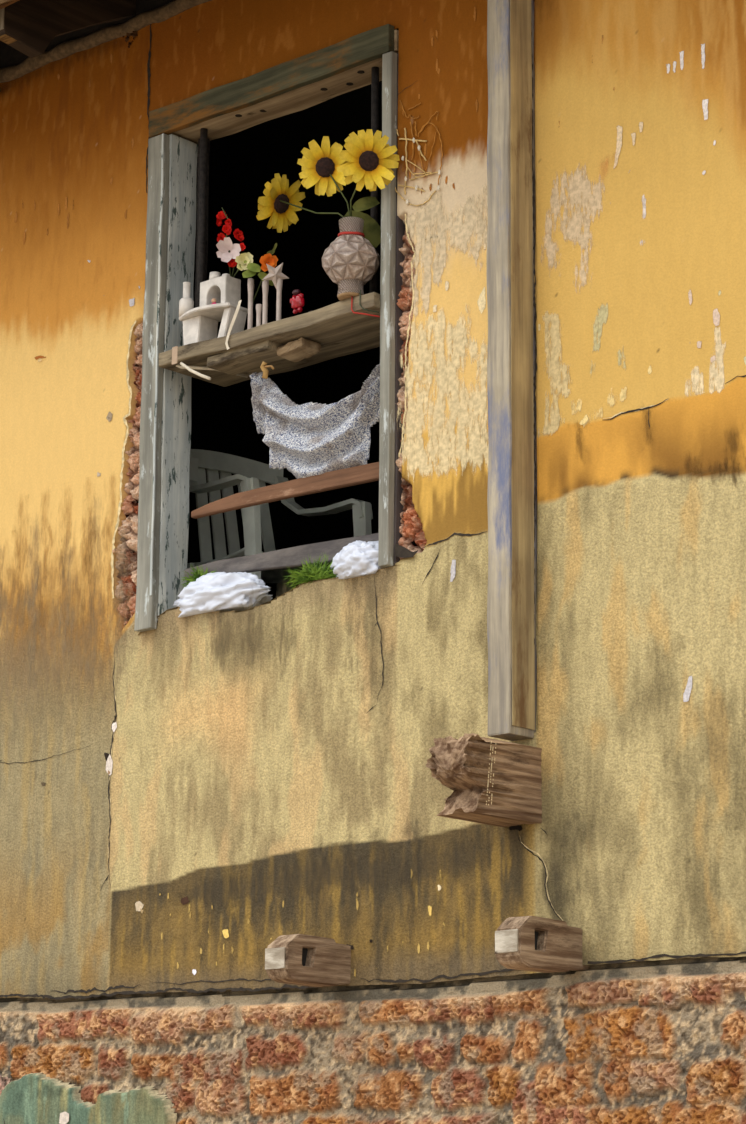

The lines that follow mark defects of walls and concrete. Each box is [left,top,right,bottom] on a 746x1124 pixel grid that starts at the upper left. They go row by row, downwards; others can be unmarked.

peeling [667,51,684,73]
peeling [613,122,643,173]
peeling [541,165,611,289]
flaking render [106,320,143,626]
peeling [395,186,489,560]
peeling [538,304,627,438]
crack [603,398,669,428]
crack [0,651,117,891]
spalling [59,1112,69,1124]